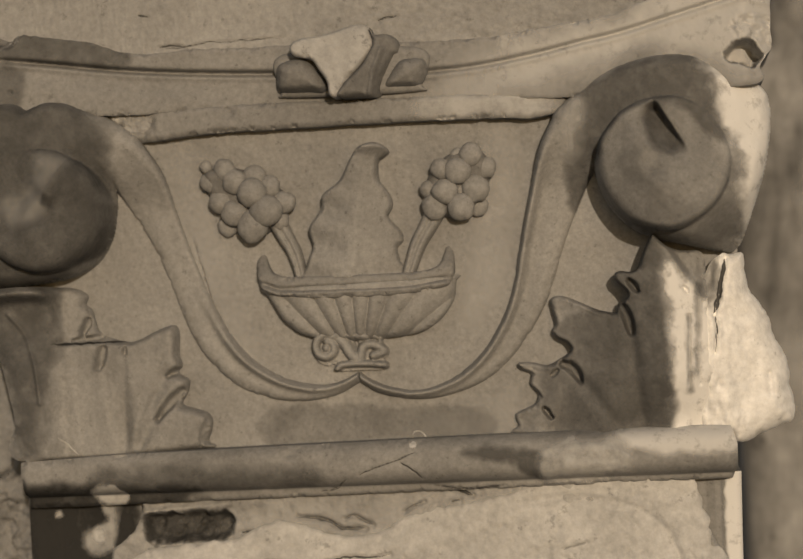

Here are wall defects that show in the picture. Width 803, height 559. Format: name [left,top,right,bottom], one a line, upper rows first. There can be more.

crack [714,259,726,352]
water stain [542,262,738,503]
crack [323,452,503,502]
spalling [143,509,235,545]